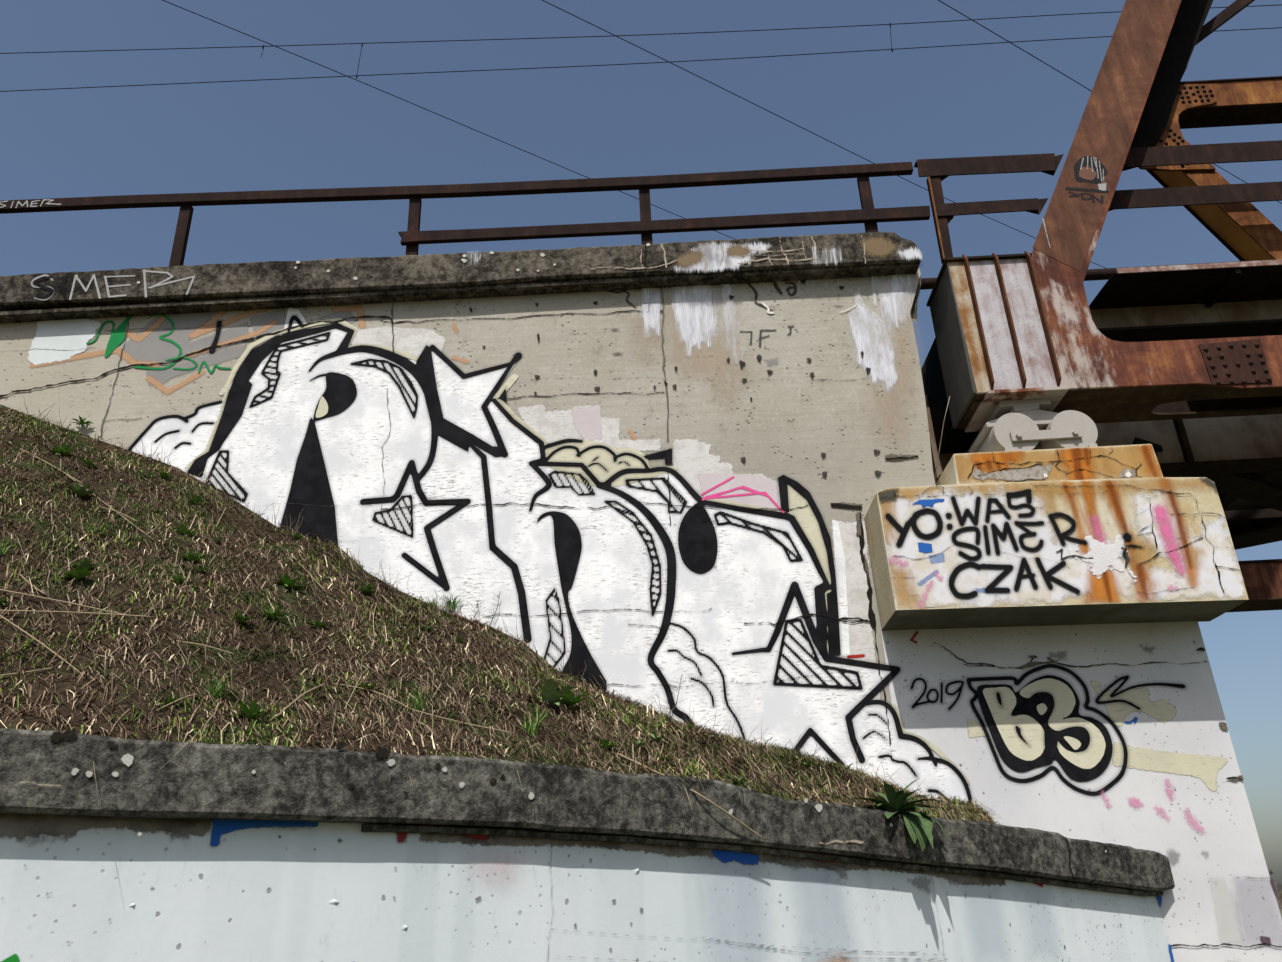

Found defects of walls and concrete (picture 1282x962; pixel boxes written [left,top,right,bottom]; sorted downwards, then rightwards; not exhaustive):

crack [0,315,394,397]
efflorescence [590,236,842,361]
efflorescence [842,235,922,390]
corrosion [948,261,991,393]
corrosion [883,444,1208,603]
crack [894,450,1241,594]
crack [484,608,711,630]
crack [744,512,948,745]
crack [934,642,1099,669]